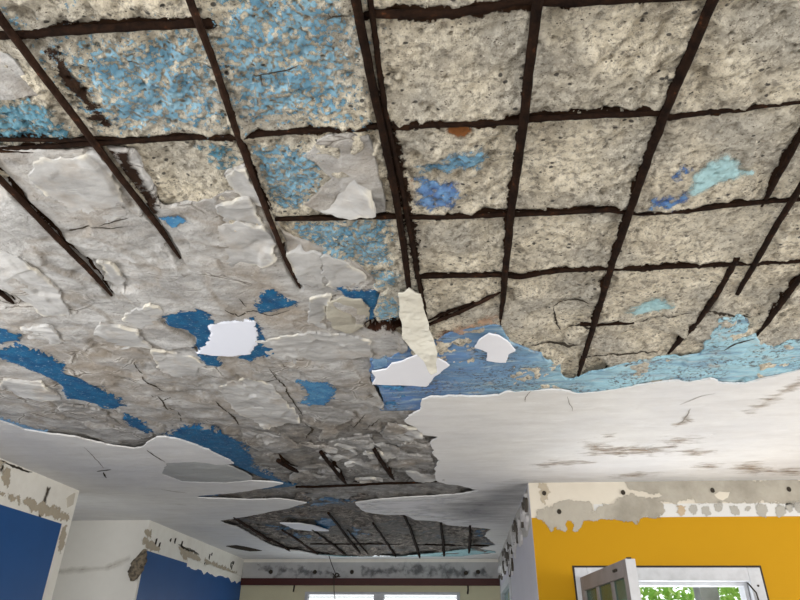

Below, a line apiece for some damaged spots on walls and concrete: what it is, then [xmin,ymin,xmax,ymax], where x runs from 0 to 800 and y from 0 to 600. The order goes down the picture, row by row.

rust [44,46,111,130]
rust [109,147,163,216]
rust [386,121,422,260]
peeling [162,308,215,350]
rust [363,316,402,333]
peeling [377,263,800,411]
crack [532,298,661,369]
peeling [0,342,127,409]
crack [134,363,181,421]
crack [268,369,314,438]
spalling [222,492,495,558]
flaking render [498,480,800,580]